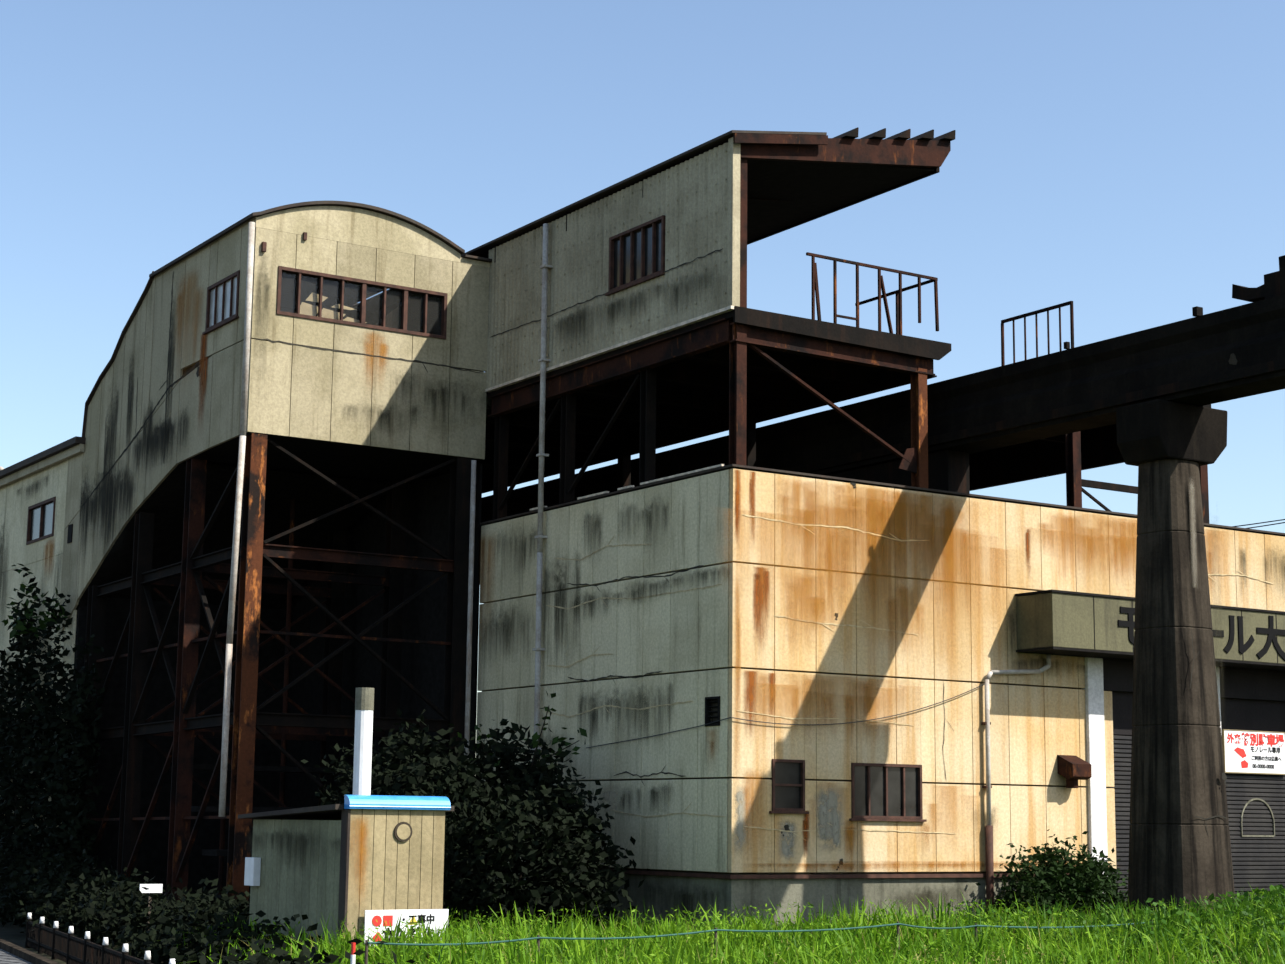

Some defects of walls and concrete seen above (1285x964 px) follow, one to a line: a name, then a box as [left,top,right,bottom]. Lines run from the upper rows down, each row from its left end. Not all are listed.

rust [200,335,208,405]
damp [80,333,187,536]
rust [736,470,755,527]
crack [546,535,722,609]
rust [754,567,769,624]
crack [545,654,692,718]
rust [746,671,775,725]